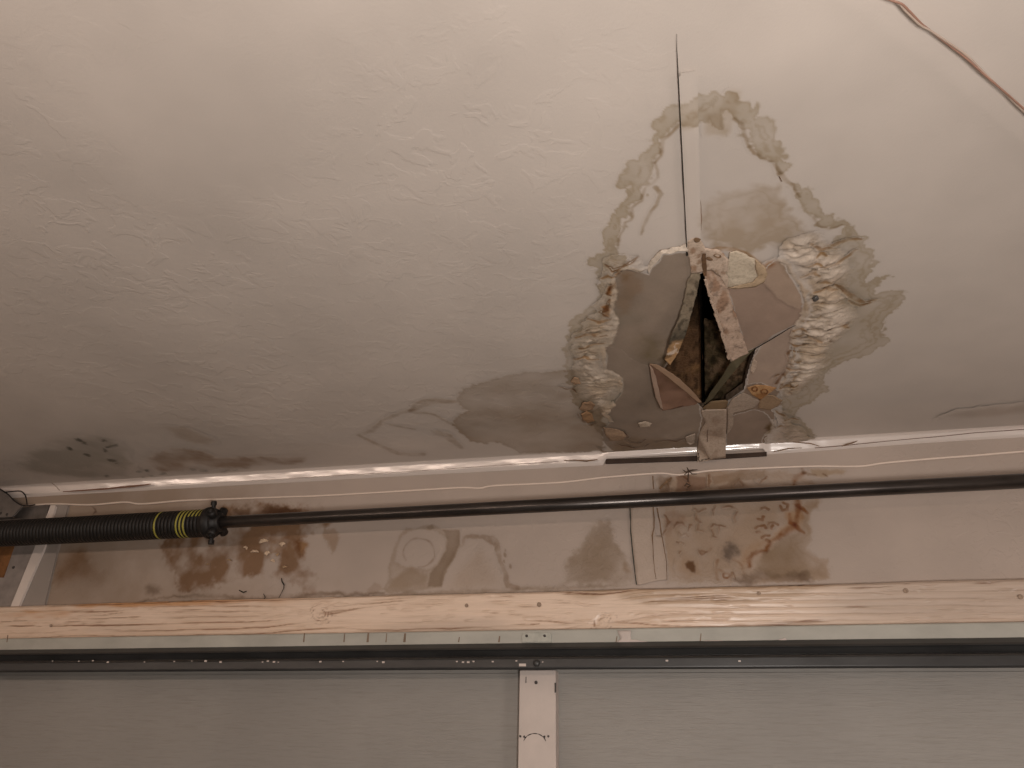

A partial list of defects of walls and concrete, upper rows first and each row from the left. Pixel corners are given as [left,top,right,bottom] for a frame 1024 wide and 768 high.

damp [353,101,680,457]
damp [694,85,910,438]
peeling [581,244,705,452]
peeling [726,250,804,445]
damp [7,424,309,479]
damp [654,466,848,493]
damp [132,498,636,603]
damp [655,499,833,587]
corrosion [745,500,810,569]